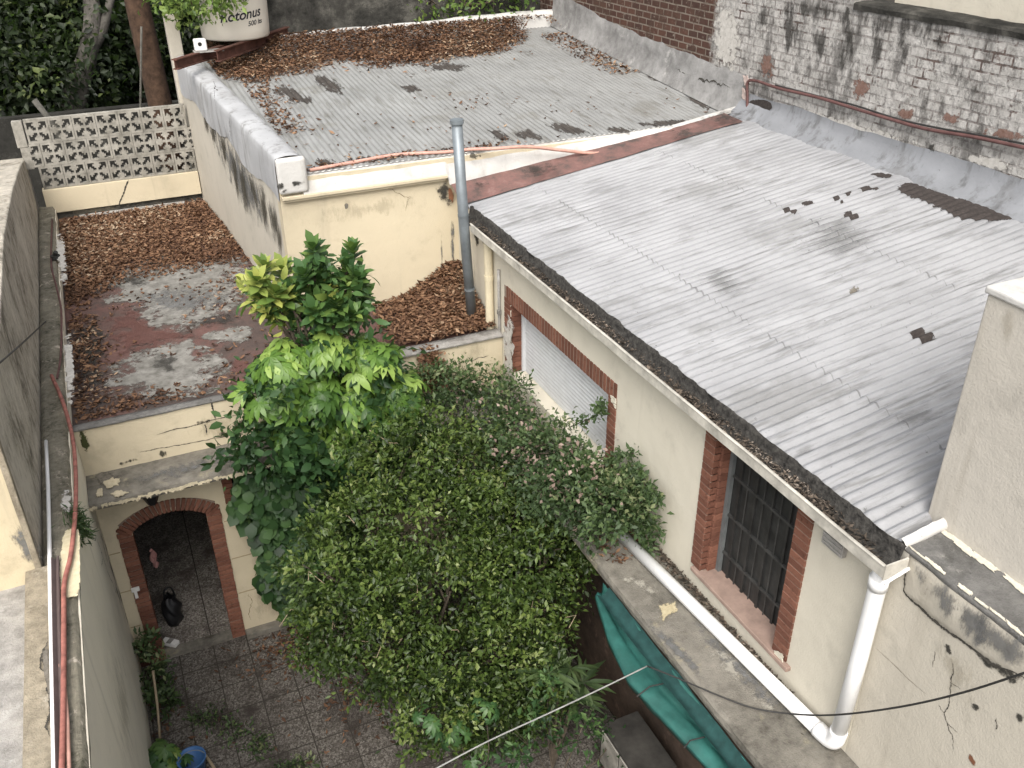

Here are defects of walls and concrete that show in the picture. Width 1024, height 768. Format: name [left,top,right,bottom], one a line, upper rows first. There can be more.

water stain [785,1,853,67]
water stain [864,15,957,74]
water stain [749,99,772,110]
water stain [203,117,281,252]
crack [142,399,235,452]
peeling [89,463,275,511]
peeling [909,545,946,575]
peeling [941,530,1024,594]
peeling [659,601,678,621]
crack [877,573,1024,745]
water stain [934,586,1023,683]
peeling [957,583,1024,636]